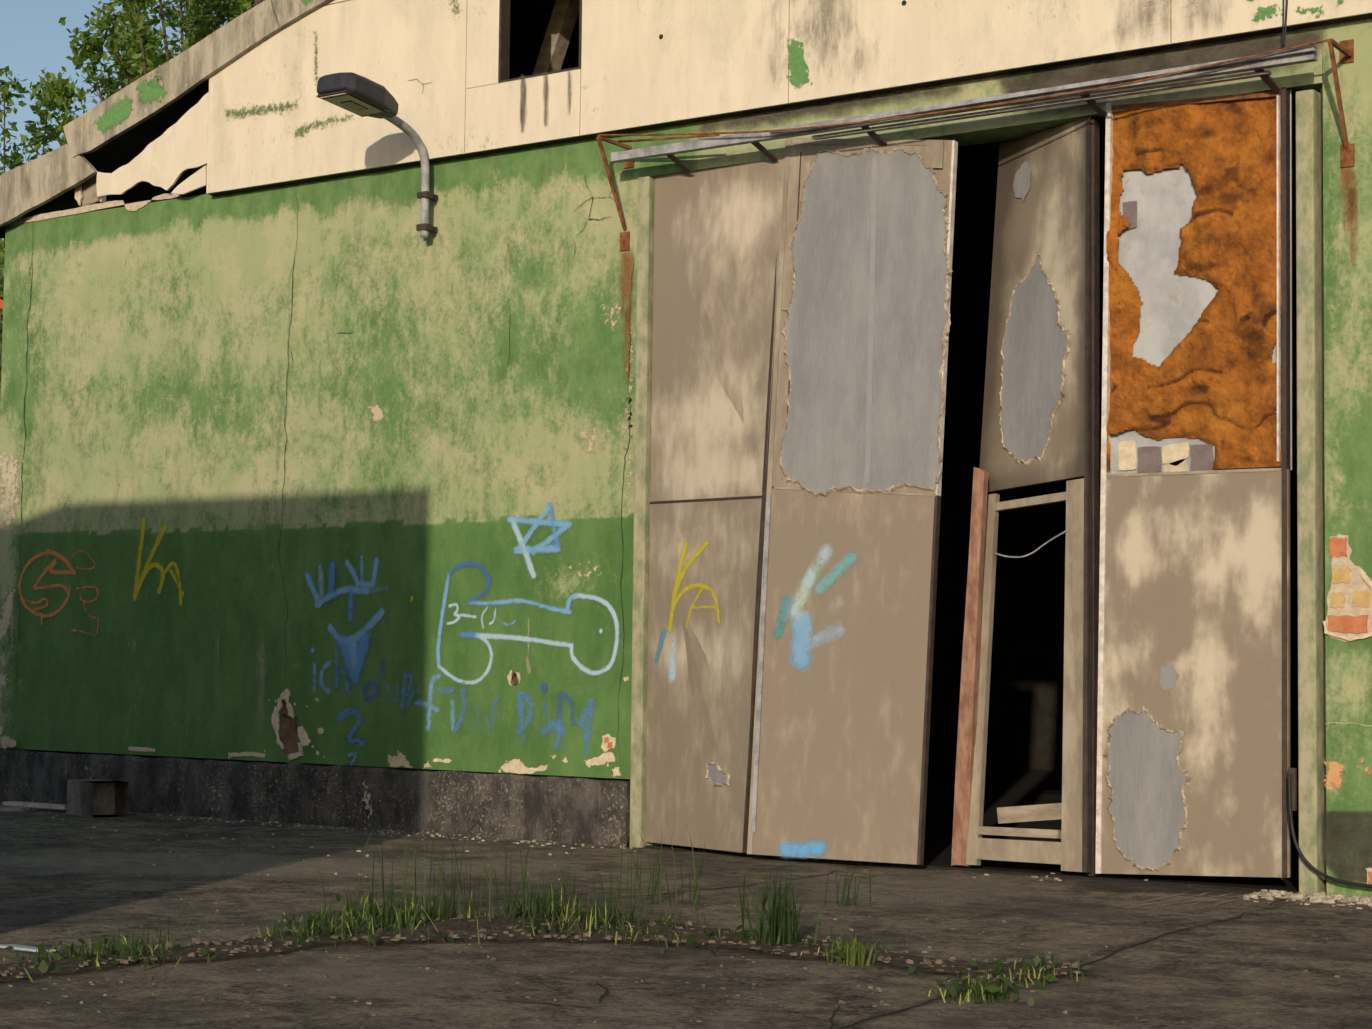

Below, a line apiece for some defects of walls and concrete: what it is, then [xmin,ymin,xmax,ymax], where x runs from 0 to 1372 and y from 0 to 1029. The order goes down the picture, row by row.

rust [622,252,632,328]
peeling [1001,255,1068,462]
peeling [0,447,27,533]
spalling [1323,534,1372,642]
peeling [0,586,16,749]
spalling [228,689,325,764]
peeling [388,751,452,769]
peeling [499,734,621,777]
peeling [1107,711,1186,868]
crack [1080,906,1278,967]
crack [829,989,967,1029]